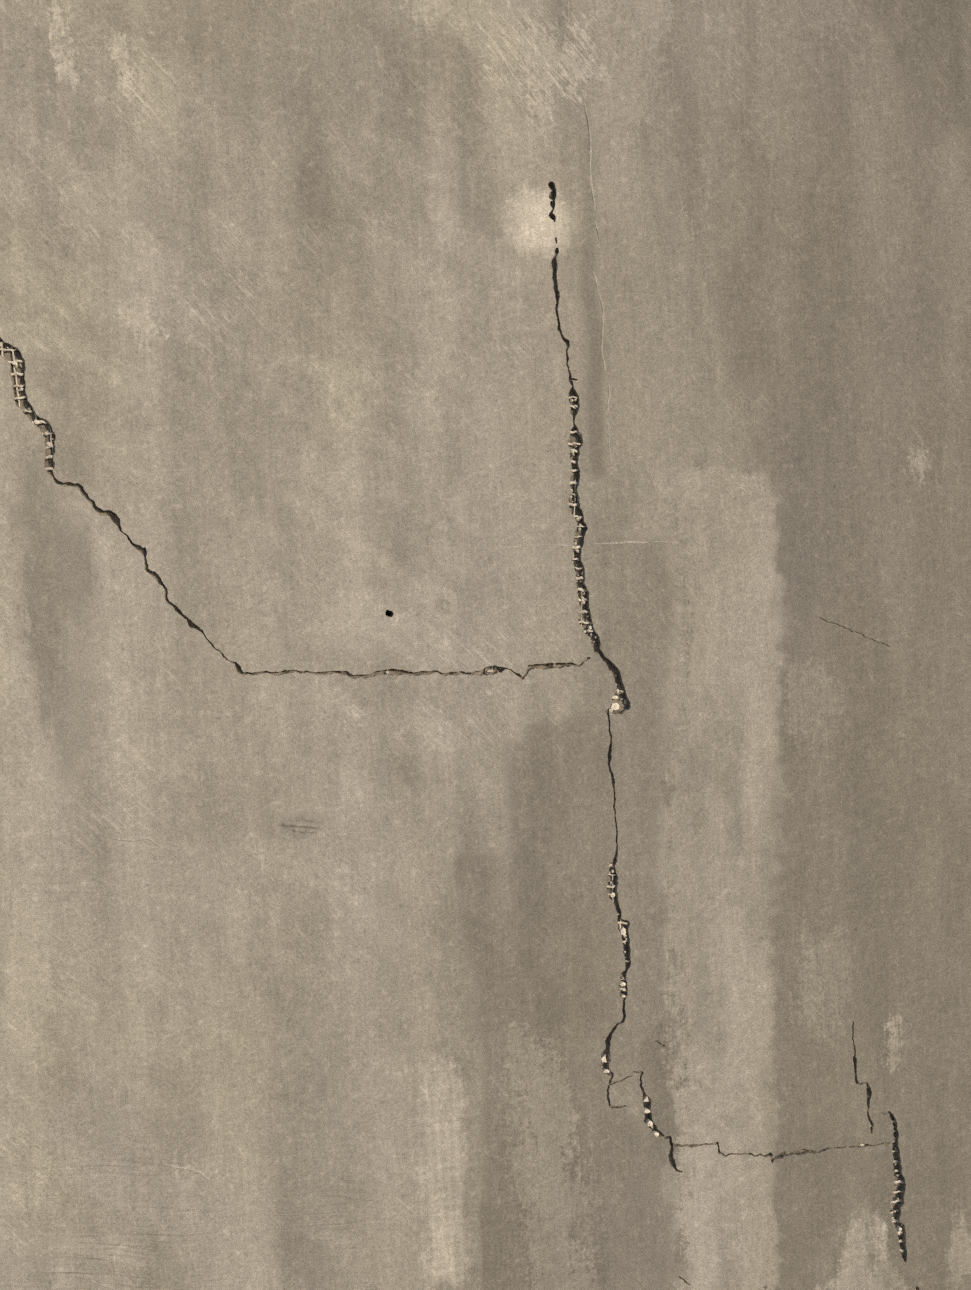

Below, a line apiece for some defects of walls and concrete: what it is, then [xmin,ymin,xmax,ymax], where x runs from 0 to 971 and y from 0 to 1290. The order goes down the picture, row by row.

crack [0,181,907,1263]